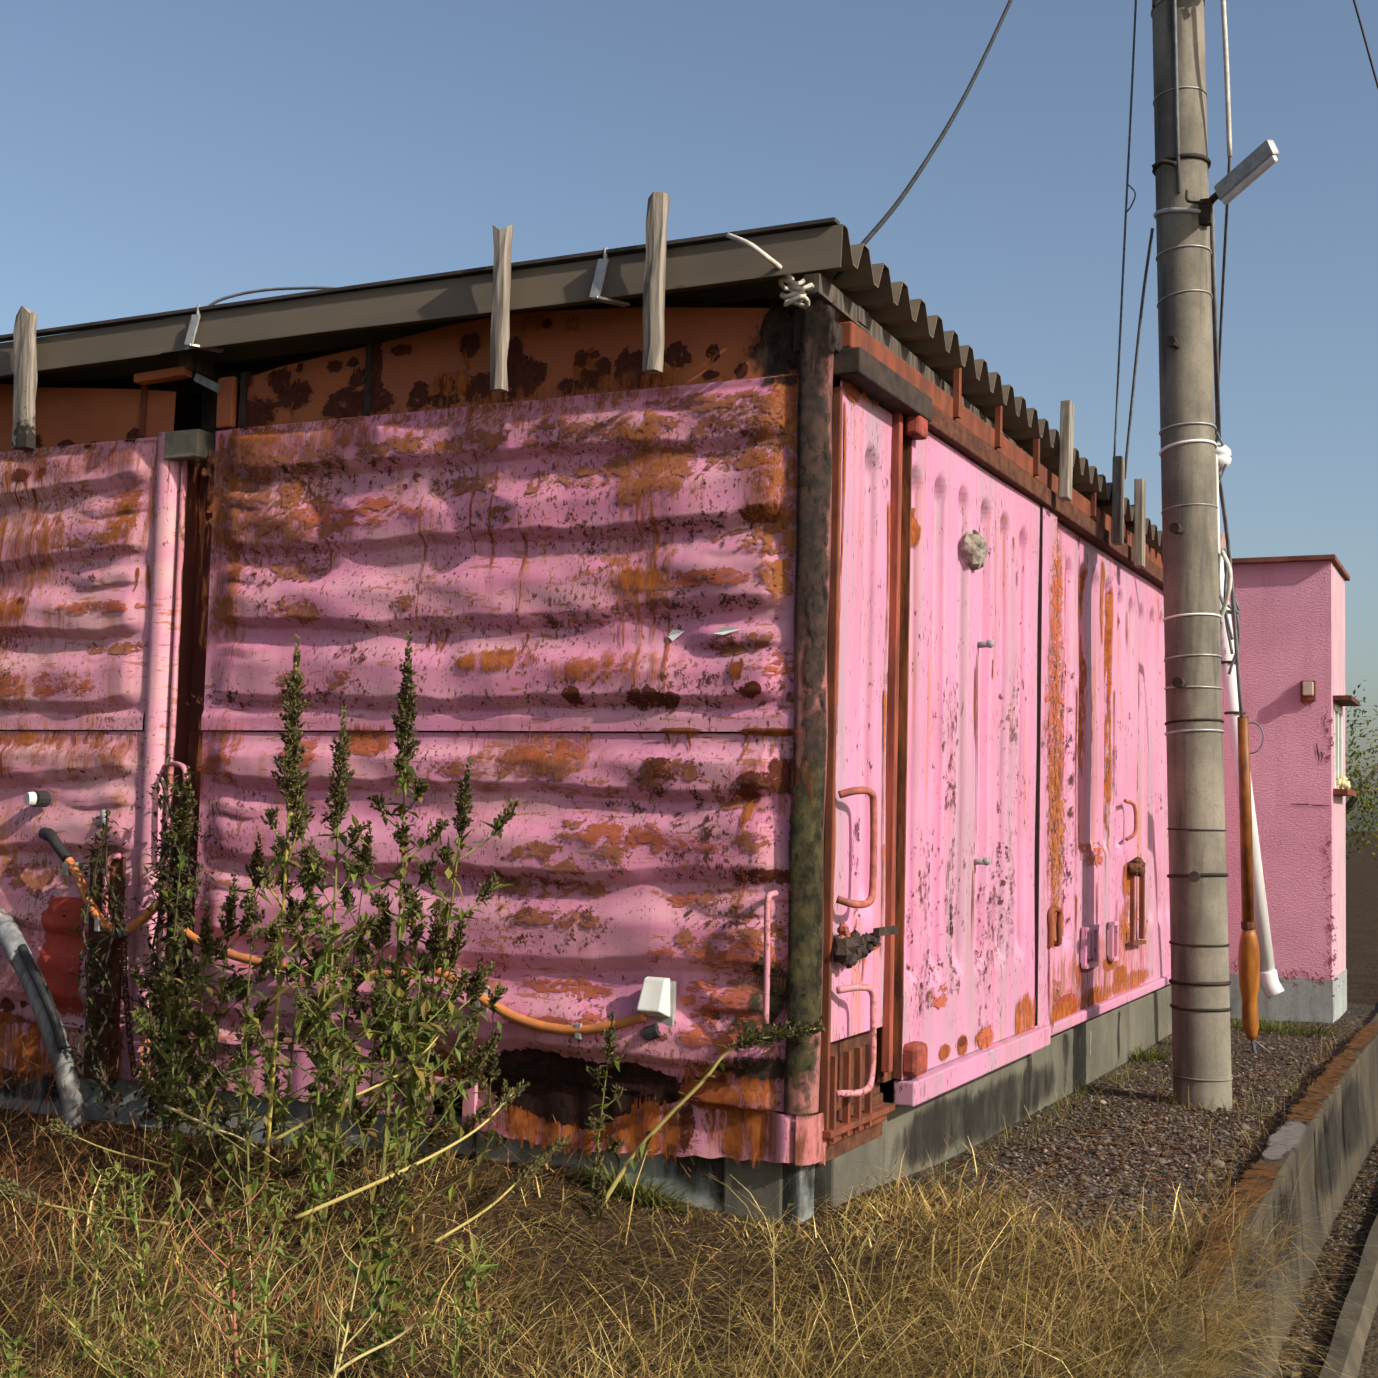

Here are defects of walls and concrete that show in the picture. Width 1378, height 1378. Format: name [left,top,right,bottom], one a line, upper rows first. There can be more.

corrosion [219,332,748,452]
corrosion [0,427,170,650]
corrosion [911,508,921,547]
corrosion [0,723,137,783]
peeling [187,372,825,1129]
corrosion [659,727,702,751]
corrosion [738,727,802,760]
water stain [801,496,829,940]
peeling [998,674,1019,758]
corrosion [1013,518,1153,1035]
peeling [906,708,1016,1035]
corrosion [497,1058,798,1166]